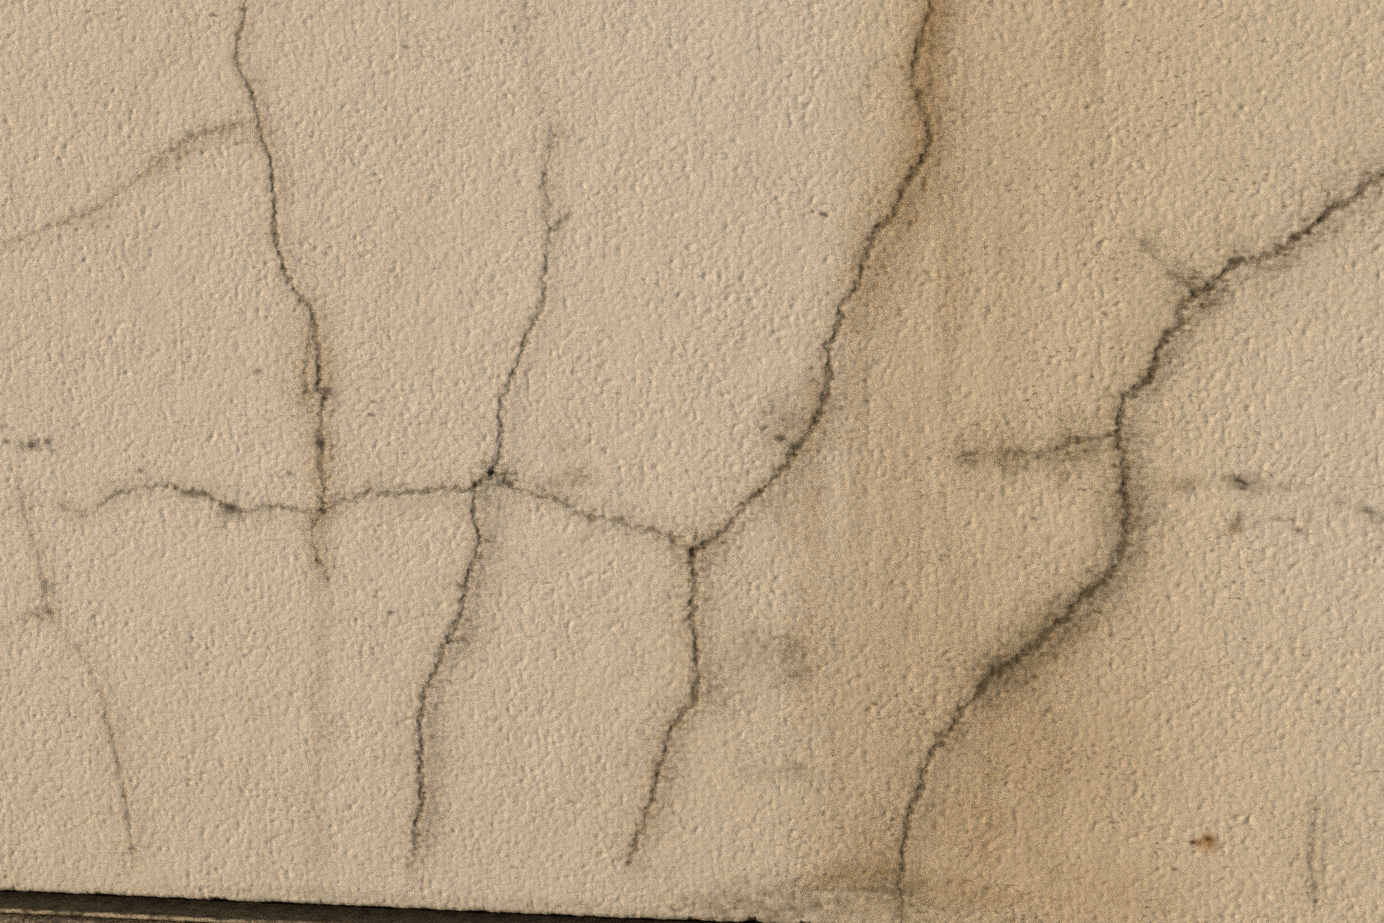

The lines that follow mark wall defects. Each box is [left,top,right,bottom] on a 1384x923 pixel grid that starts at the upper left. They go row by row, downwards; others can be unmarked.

crack [828,133,939,379]
crack [419,511,491,715]
crack [628,536,725,863]
crack [743,412,819,503]
crack [891,171,1384,900]